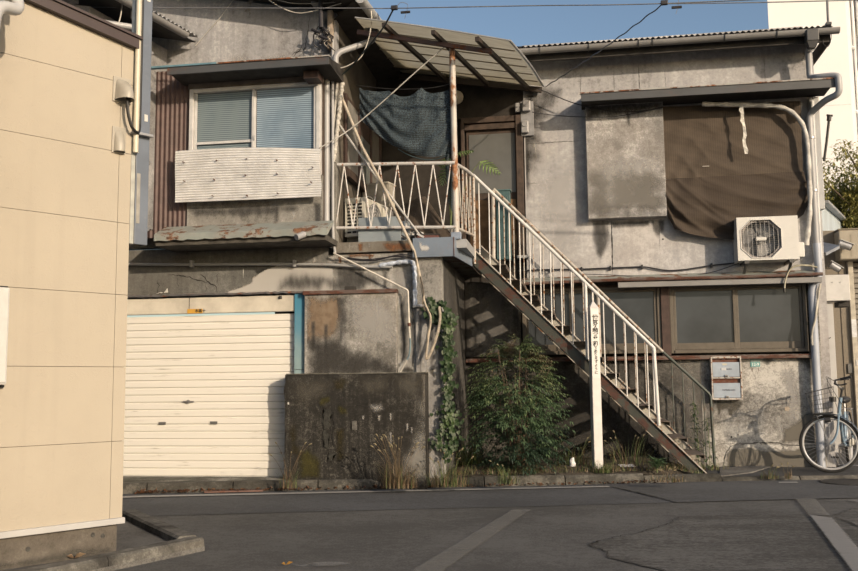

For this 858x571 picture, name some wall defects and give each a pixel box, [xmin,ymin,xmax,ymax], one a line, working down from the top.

water stain [591,172,663,256]
water stain [285,270,441,415]
water stain [406,433,437,478]